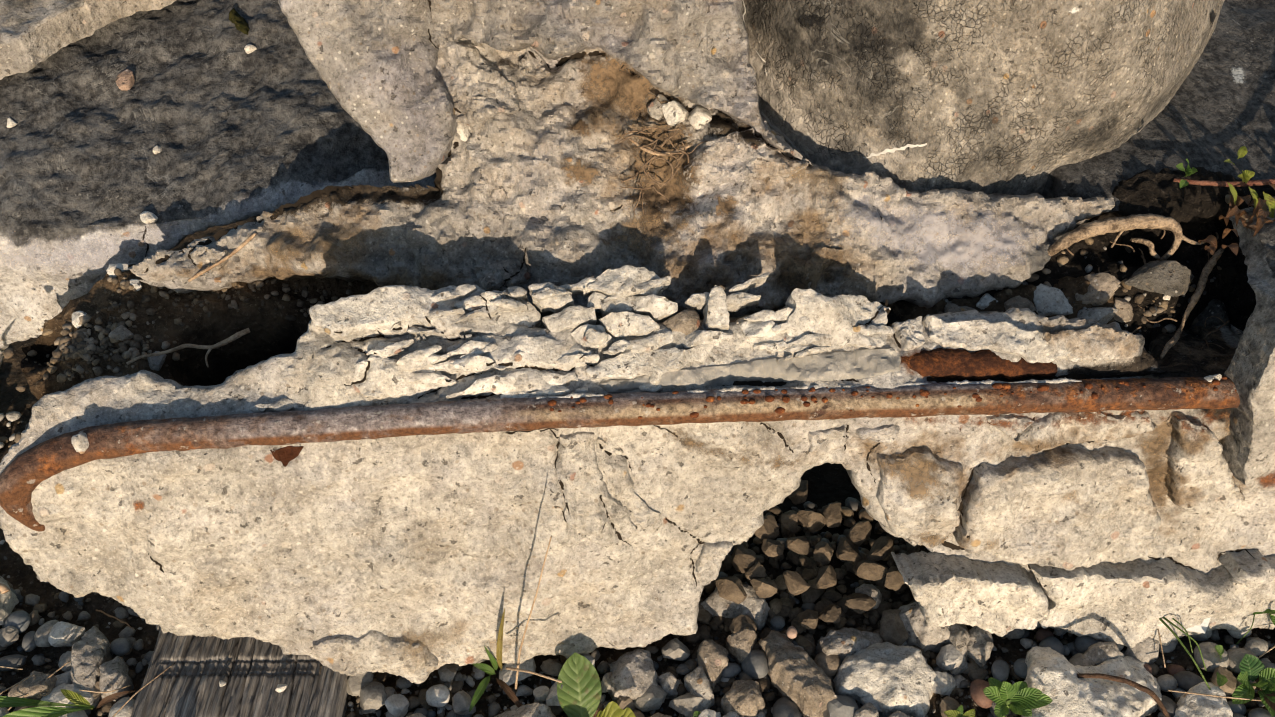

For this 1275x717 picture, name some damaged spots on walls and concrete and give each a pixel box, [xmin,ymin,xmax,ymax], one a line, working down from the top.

spalling [662,100,809,191]
spalling [140,211,158,224]
spalling [106,245,229,291]
spalling [72,311,87,328]
spalling [309,247,1145,400]
spalling [229,399,298,413]
corrosion [0,348,1240,532]
spalling [556,432,661,547]
crack [665,518,704,586]
spalling [695,540,736,573]
crack [1148,549,1270,573]
spalling [313,630,438,687]